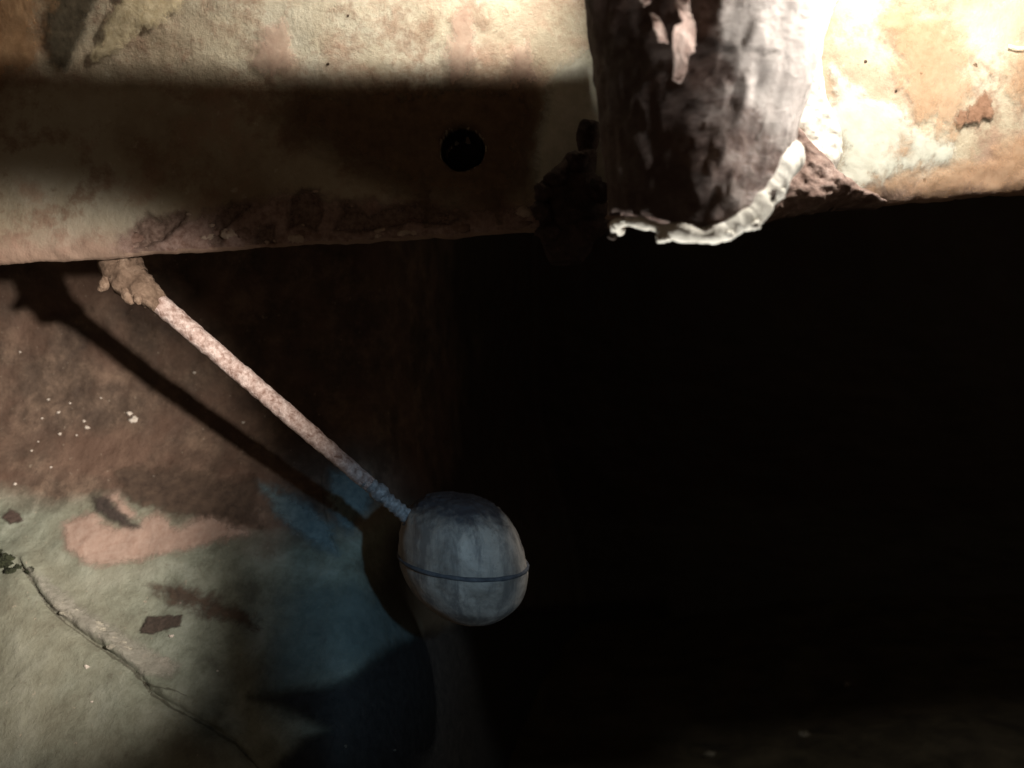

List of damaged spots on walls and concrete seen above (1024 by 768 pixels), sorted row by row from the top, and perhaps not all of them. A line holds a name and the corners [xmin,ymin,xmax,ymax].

peeling [640,0,696,83]
crack [40,579,175,674]